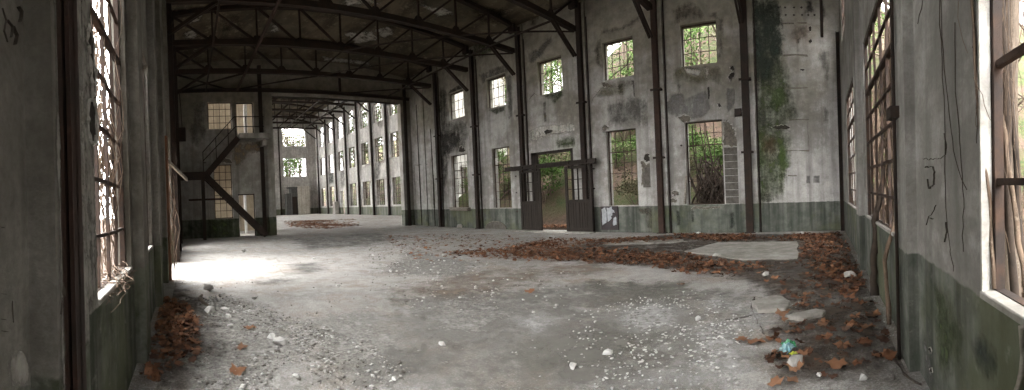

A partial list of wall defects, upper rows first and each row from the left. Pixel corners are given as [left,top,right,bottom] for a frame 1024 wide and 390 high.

damp [753,1,781,81]
damp [600,81,646,122]
flaking render [667,66,739,209]